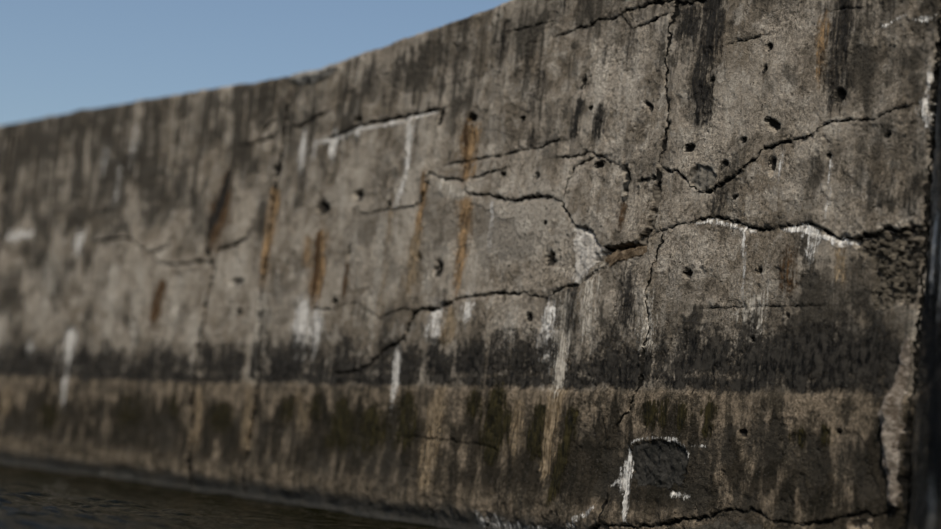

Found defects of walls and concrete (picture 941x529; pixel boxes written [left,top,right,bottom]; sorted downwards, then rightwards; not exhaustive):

leakage [297,111,438,206]
corrosion [457,119,482,185]
leakage [569,97,607,142]
leakage [919,60,941,127]
crack [95,92,445,495]
corrosion [306,224,330,305]
corrosion [402,171,429,295]
corrosion [438,197,473,347]
crack [312,0,941,529]
spalling [850,226,927,311]
leakage [0,176,903,524]
spalling [632,438,688,489]